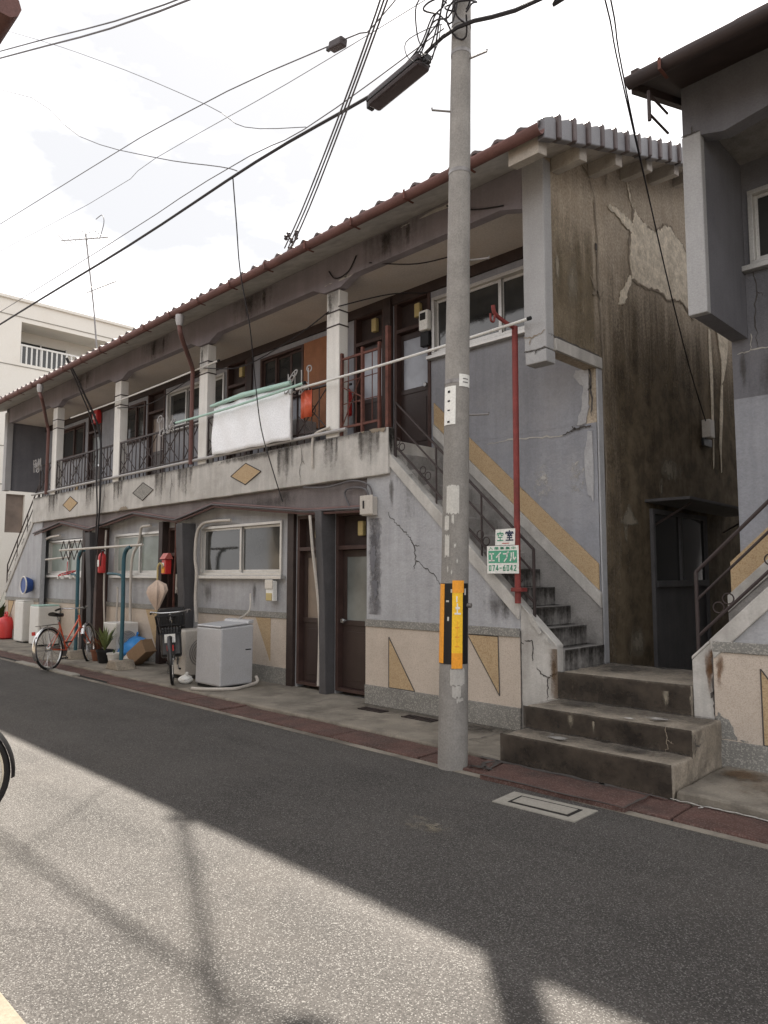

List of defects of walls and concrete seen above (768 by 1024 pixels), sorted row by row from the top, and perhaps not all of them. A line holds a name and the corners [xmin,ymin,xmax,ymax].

flaking render [607,182,694,321]
crack [487,164,608,542]
crack [388,512,440,584]
water stain [500,224,741,801]
crack [520,631,553,713]